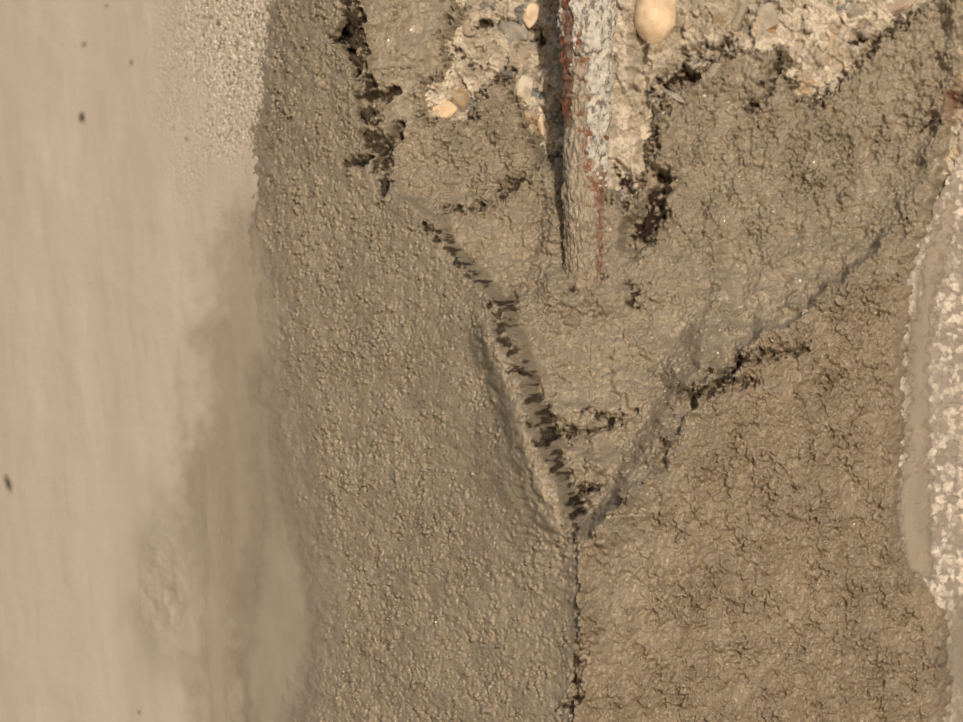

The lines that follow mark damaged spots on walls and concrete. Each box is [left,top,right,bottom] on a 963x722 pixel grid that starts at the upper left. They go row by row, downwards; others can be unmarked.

crack [332,0,405,194]
spalling [425,0,564,156]
spalling [605,0,935,211]
spalling [936,71,963,200]
crack [423,177,641,541]
crack [692,343,809,398]